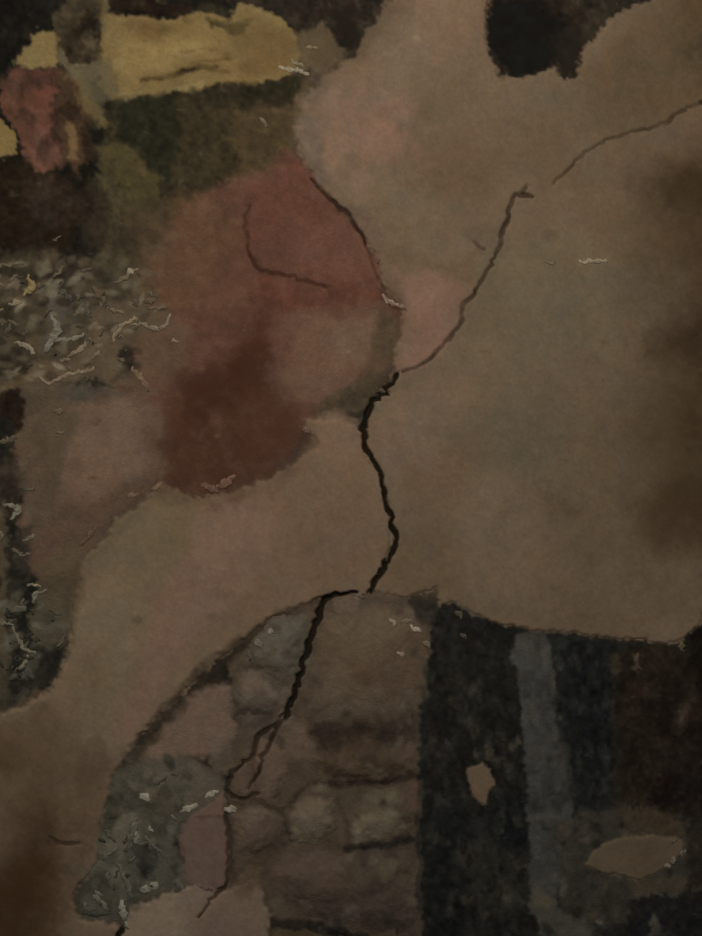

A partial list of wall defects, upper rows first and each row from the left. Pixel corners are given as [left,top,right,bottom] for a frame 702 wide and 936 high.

crack [225,178,533,800]
crack [198,879,229,918]